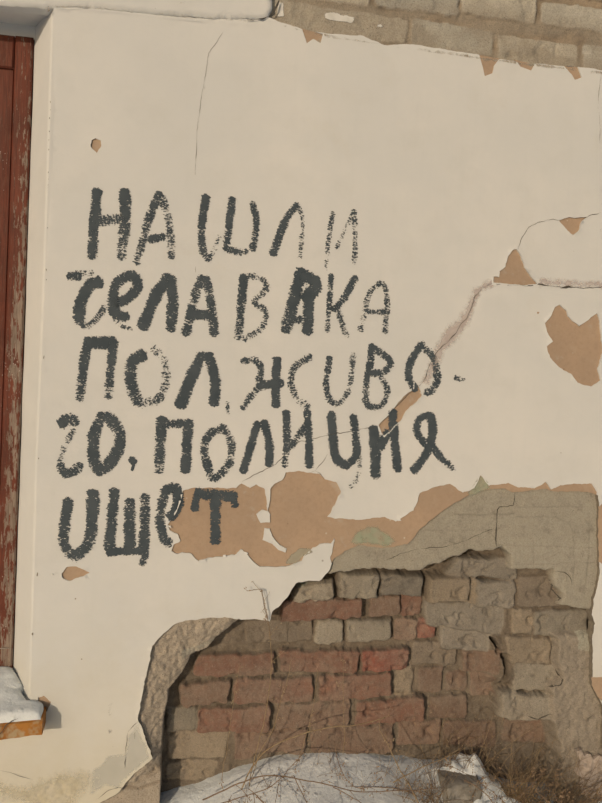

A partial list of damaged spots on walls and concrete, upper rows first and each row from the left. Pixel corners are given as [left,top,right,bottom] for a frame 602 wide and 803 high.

peeling [302,29,323,43]
peeling [479,55,500,76]
peeling [565,67,581,80]
crack [528,282,601,290]
peeling [545,305,602,386]
crack [297,284,499,443]
peeling [51,566,89,580]
flaking render [101,471,602,803]